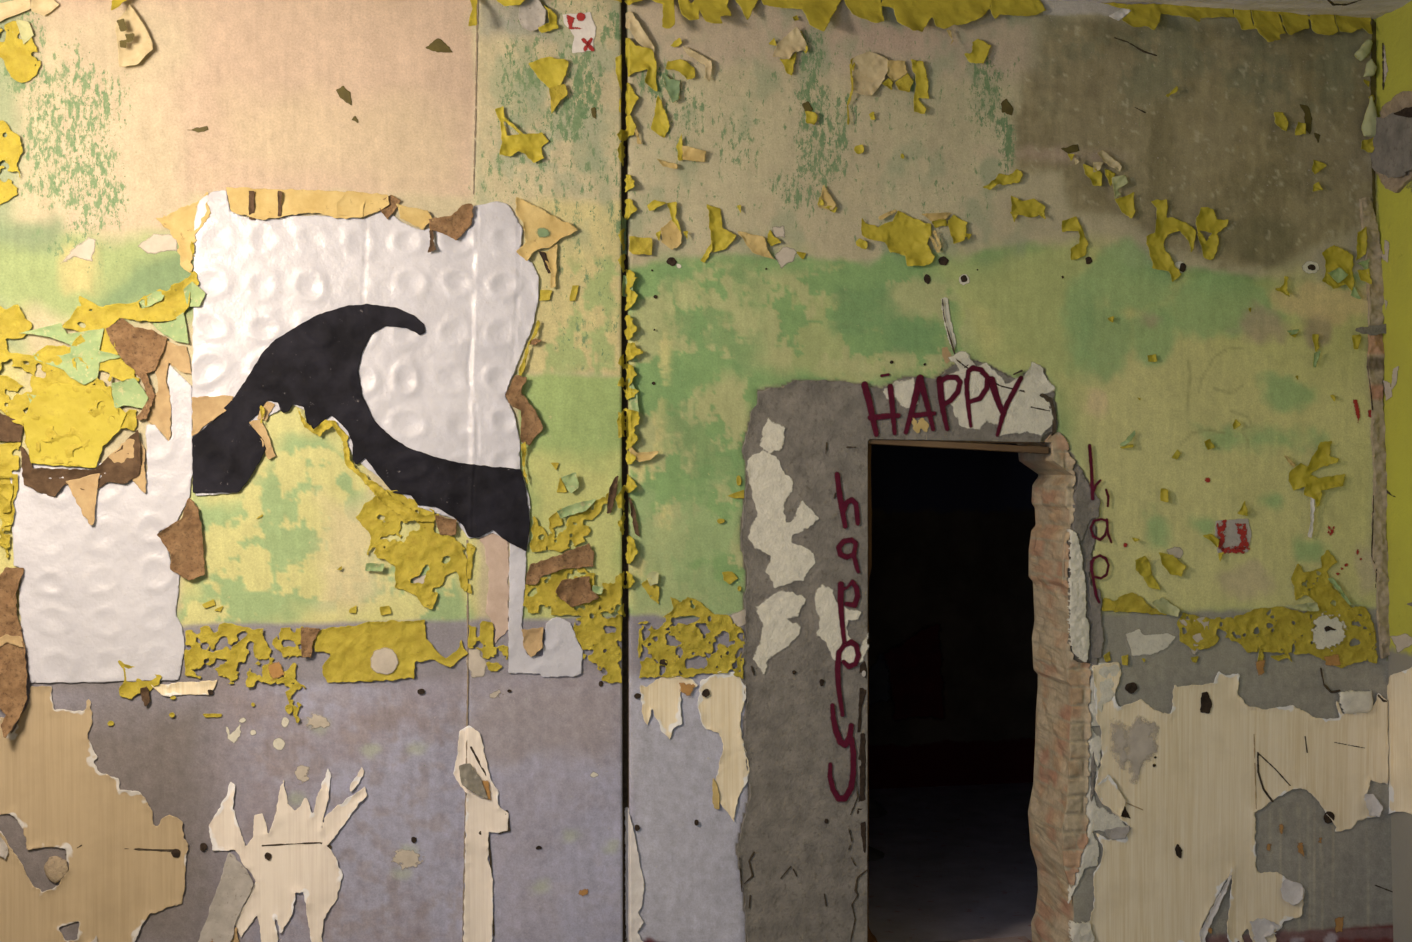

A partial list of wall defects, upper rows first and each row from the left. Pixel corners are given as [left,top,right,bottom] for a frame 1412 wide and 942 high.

peeling [1104,2,1412,299]
peeling [0,0,1046,728]
spalling [1383,366,1399,401]
flaking render [637,297,1378,942]
peeling [273,738,285,750]
peeling [295,765,309,782]
peeling [350,767,364,791]